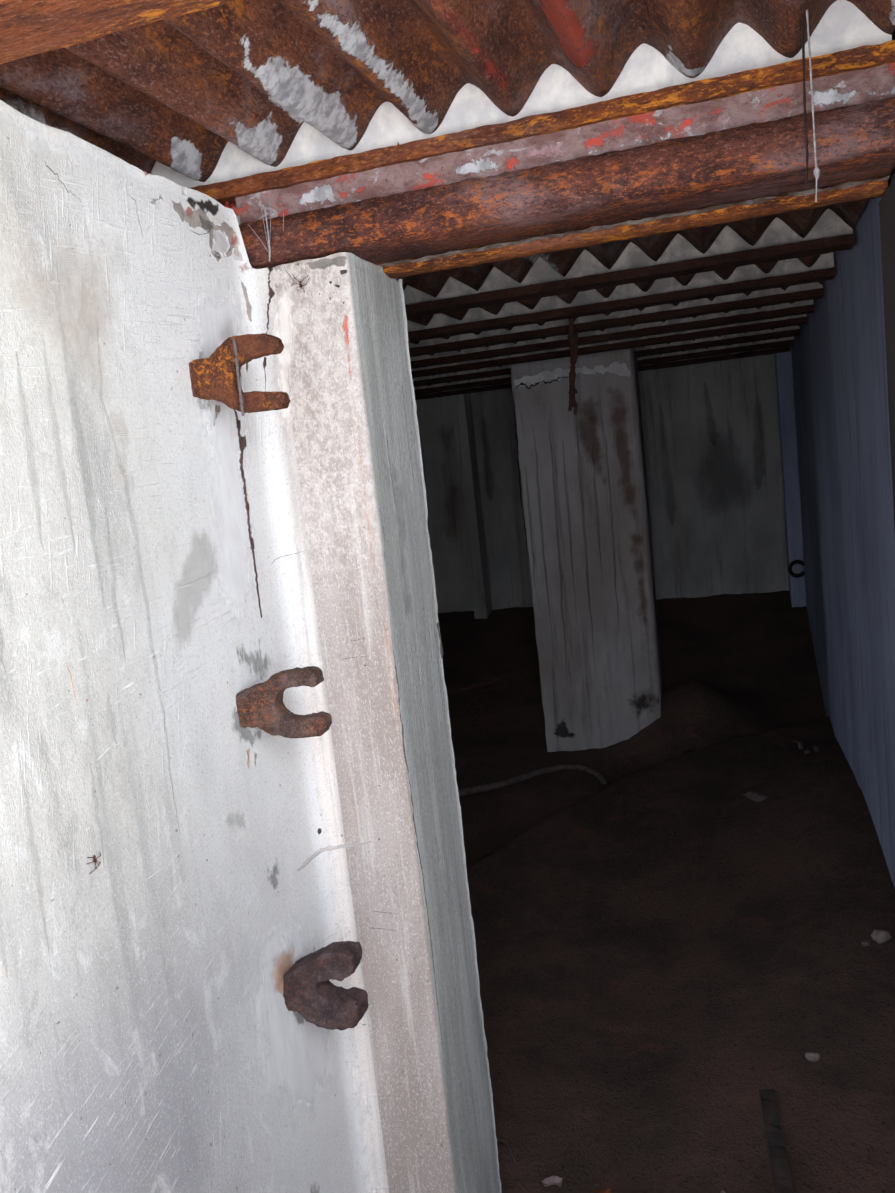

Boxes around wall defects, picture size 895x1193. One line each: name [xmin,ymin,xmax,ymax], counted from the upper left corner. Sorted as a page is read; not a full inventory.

peeling [584,107,730,155]
peeling [151,187,252,321]
crack [234,410,262,618]
rust [272,950,301,994]